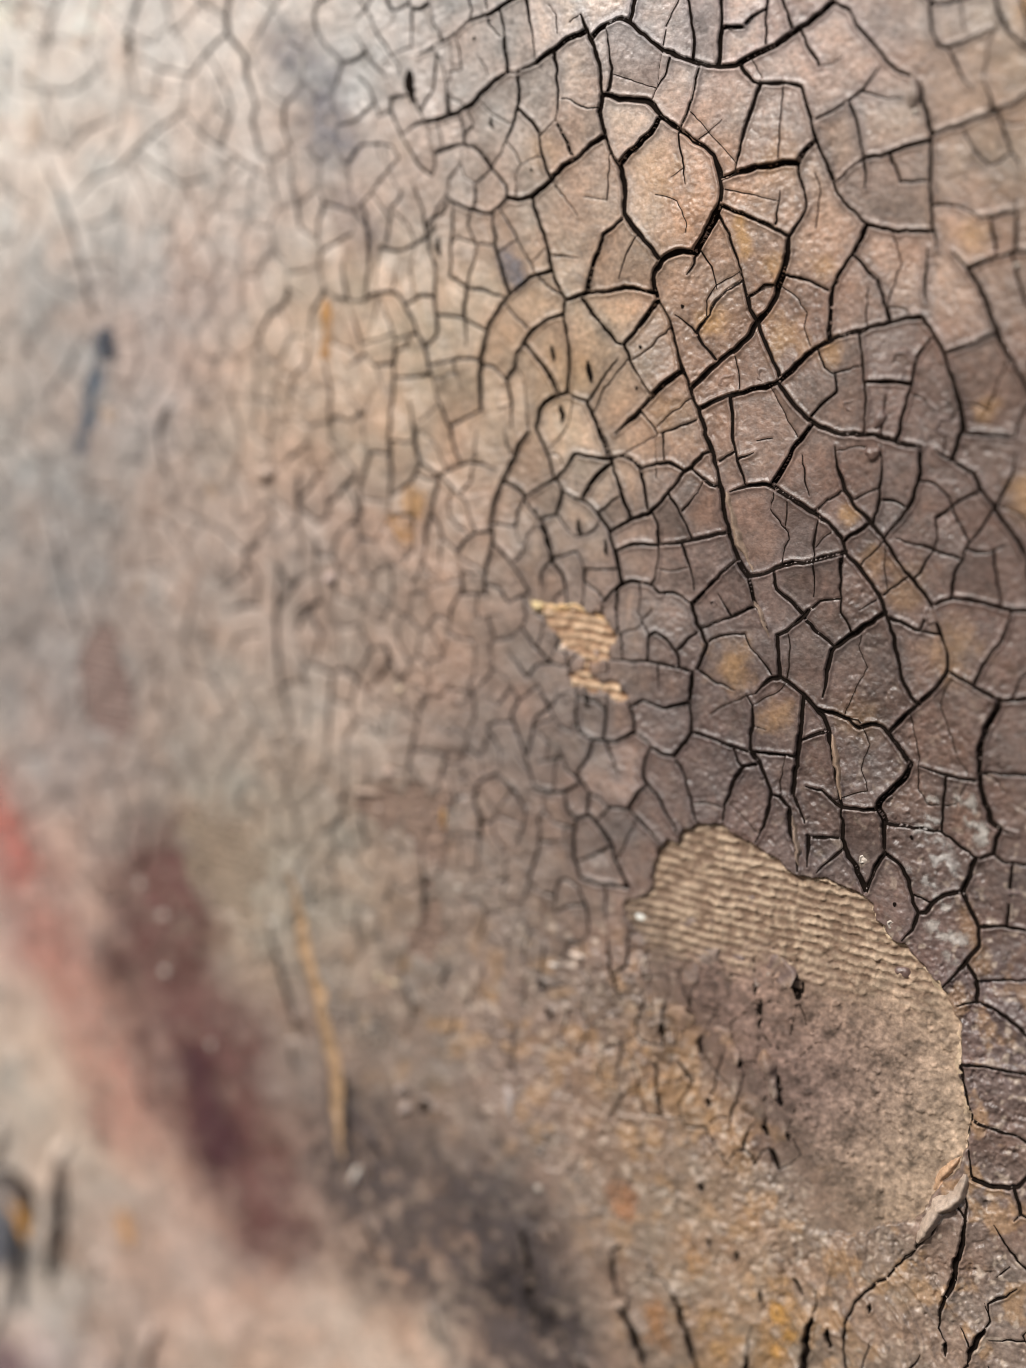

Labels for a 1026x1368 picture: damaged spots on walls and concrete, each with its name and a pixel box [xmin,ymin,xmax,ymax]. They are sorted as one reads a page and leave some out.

crack [97,0,274,190]
crack [205,523,448,787]
peeling [531,601,629,702]
crack [290,0,1026,1368]
peeling [628,823,972,1231]